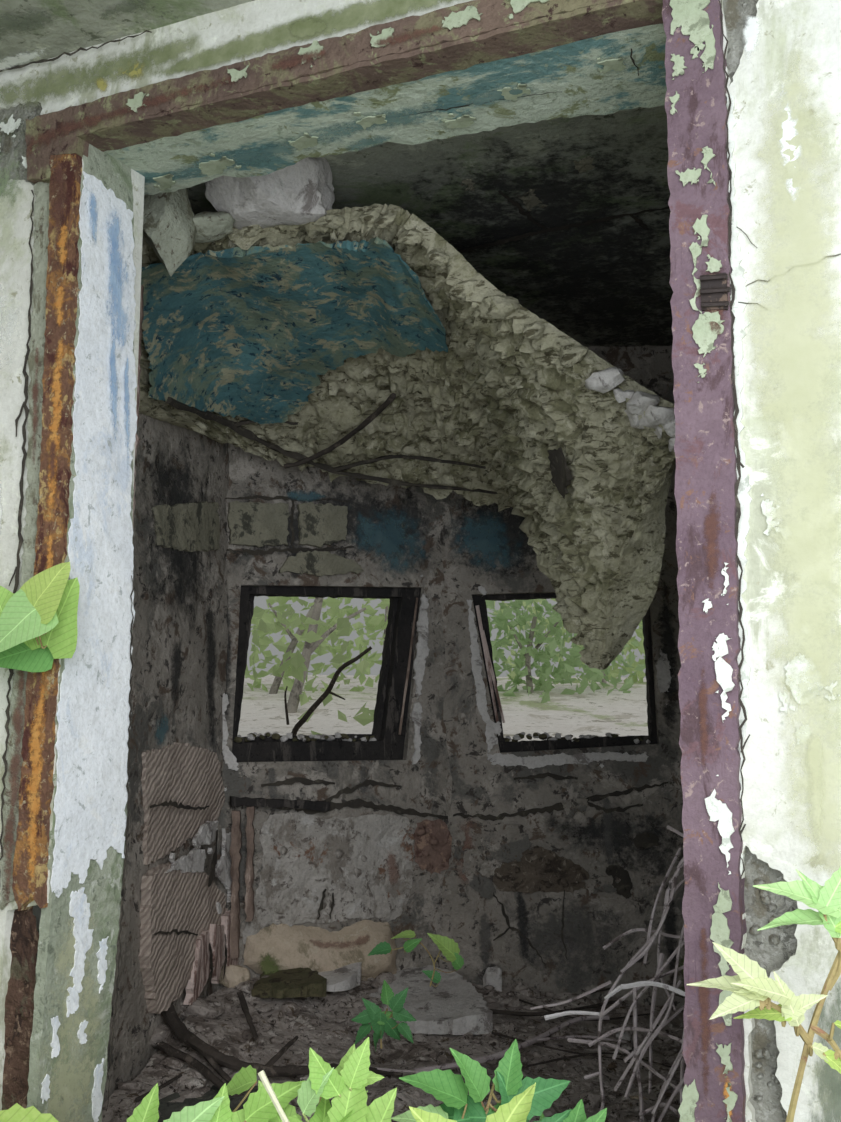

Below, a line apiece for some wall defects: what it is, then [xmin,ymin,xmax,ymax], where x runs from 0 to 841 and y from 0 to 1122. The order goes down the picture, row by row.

peeling [441,6,483,30]
corrosion [27,78,234,156]
corrosion [57,226,68,264]
corrosion [55,286,64,326]
corrosion [32,341,63,520]
spalling [669,0,798,978]
peeling [50,132,648,1058]
corrosion [4,670,45,905]
crack [106,575,668,1111]
peeling [91,1058,104,1122]
peeling [678,1079,699,1122]
spalling [716,1006,787,1122]